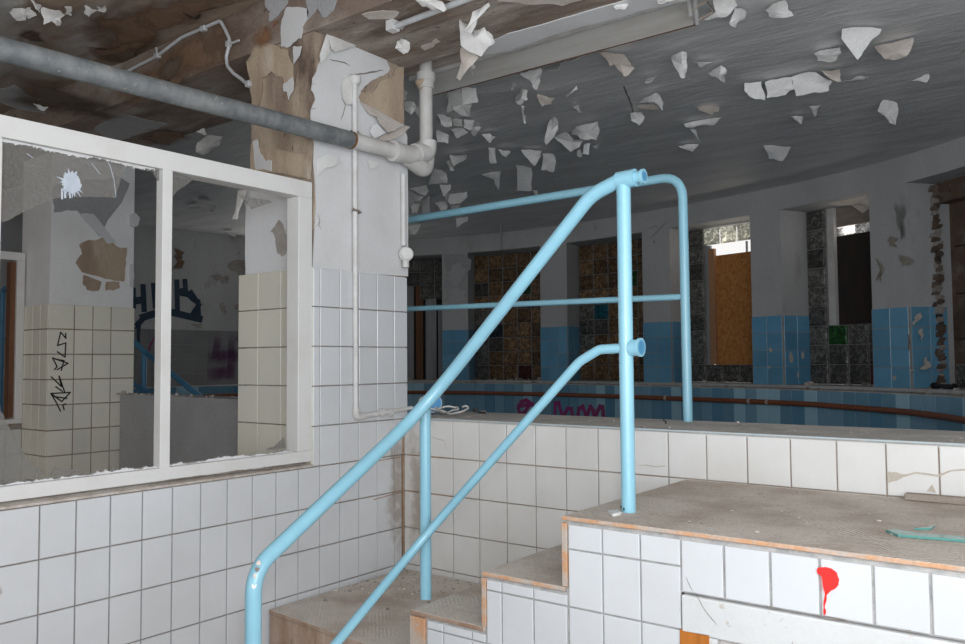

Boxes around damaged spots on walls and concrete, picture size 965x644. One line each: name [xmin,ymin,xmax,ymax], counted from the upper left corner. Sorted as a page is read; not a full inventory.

peeling [9,0,72,26]
peeling [246,0,337,106]
peeling [250,140,340,179]
spalling [319,34,419,141]
peeling [362,0,440,54]
peeling [408,0,688,227]
peeling [671,51,727,83]
peeling [699,0,747,27]
peeling [744,27,914,125]
spalling [53,178,134,291]
spalling [908,185,947,384]
crack [888,469,965,493]